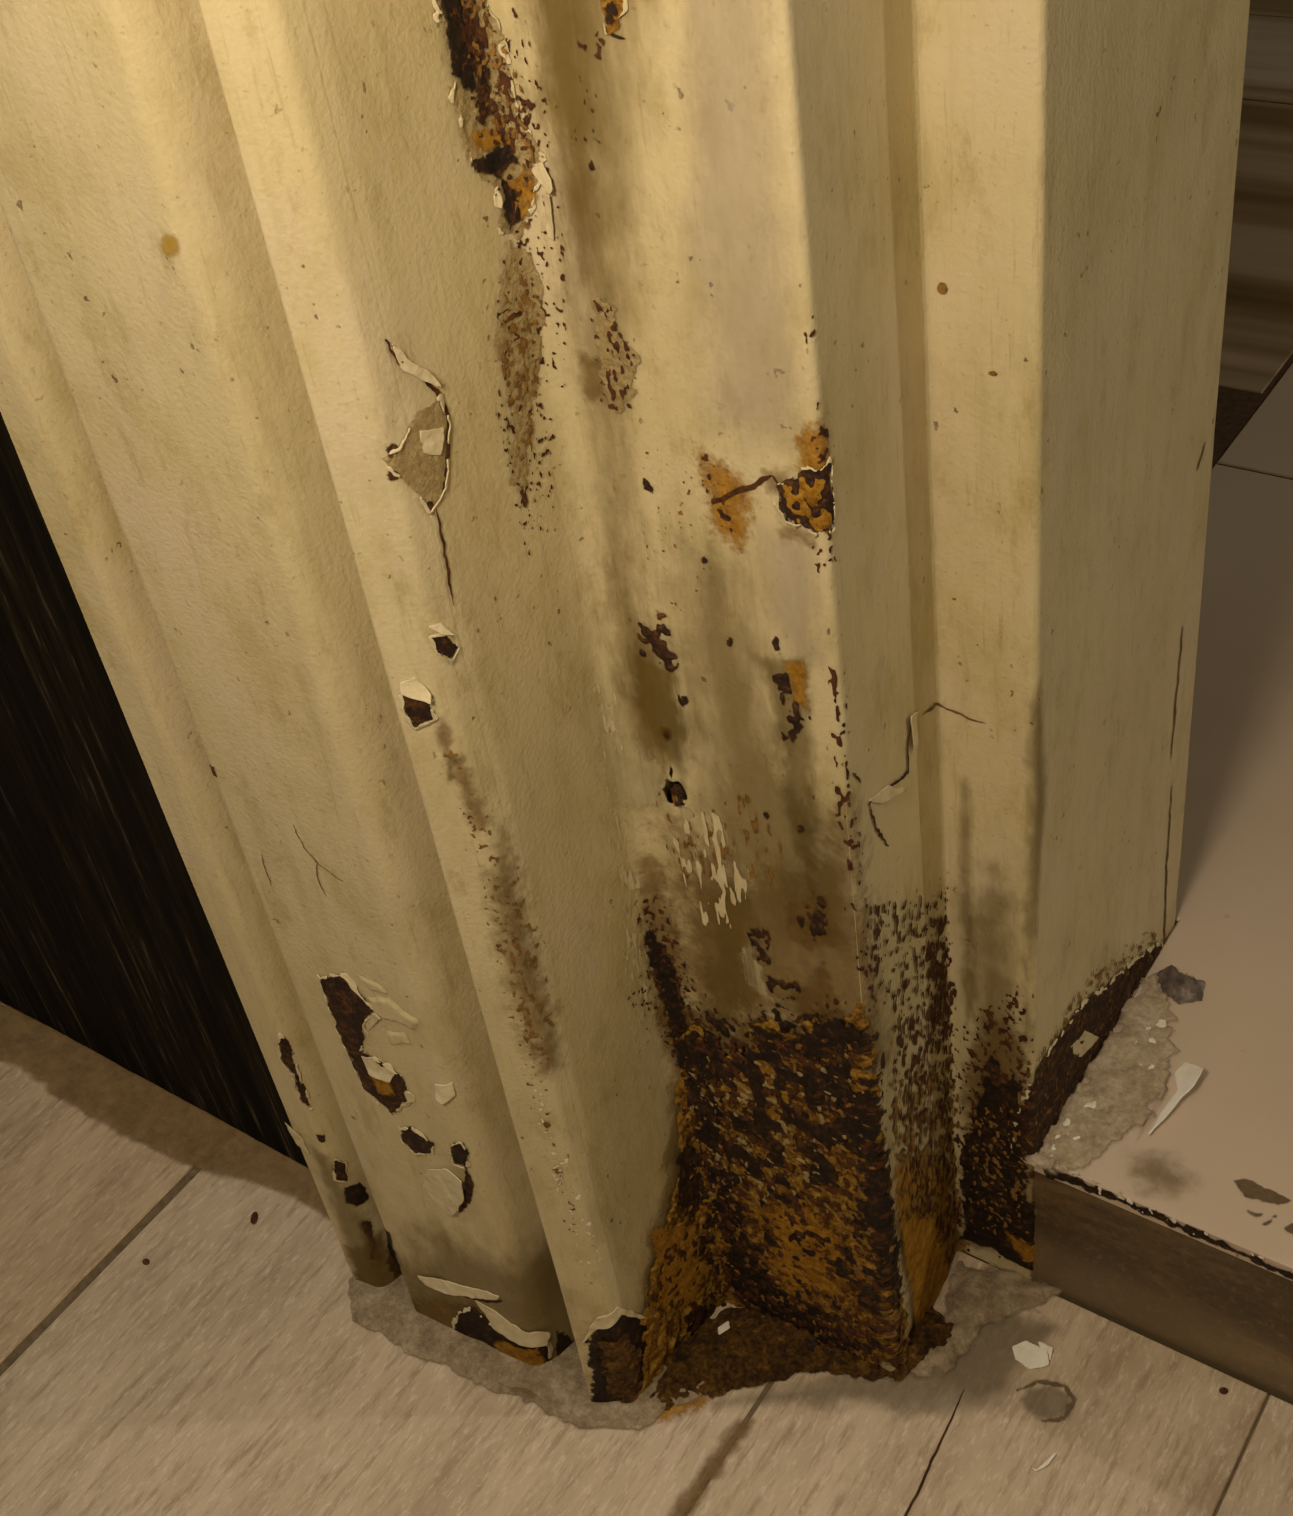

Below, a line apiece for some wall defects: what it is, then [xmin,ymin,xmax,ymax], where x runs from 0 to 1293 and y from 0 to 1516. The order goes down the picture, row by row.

rust [431,0,555,240]
rust [571,0,628,144]
spalling [382,339,454,605]
rust [699,422,837,573]
spalling [399,677,449,747]
rust [637,613,679,672]
rust [772,636,811,743]
peeling [316,973,474,1217]
rust [556,840,1165,1419]
spalling [1026,973,1293,1280]
peeling [412,1275,554,1366]
crack [904,1389,965,1516]